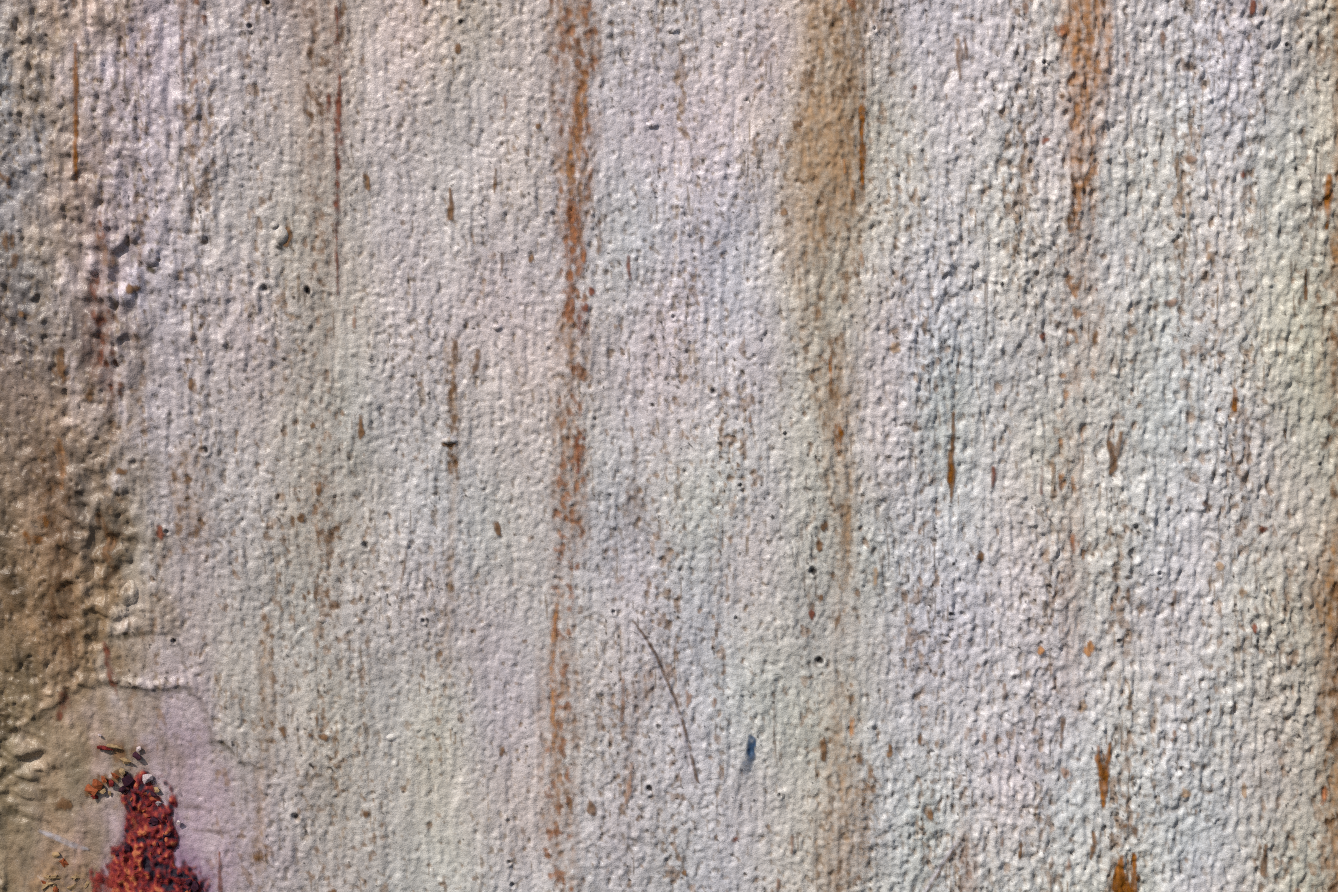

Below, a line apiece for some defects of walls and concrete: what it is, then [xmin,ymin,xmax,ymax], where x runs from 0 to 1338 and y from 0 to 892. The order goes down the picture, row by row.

rust [557,0,599,360]
rust [797,0,865,256]
rust [1055,0,1110,124]
rust [557,417,585,490]
rust [57,798,72,810]
rust [84,734,221,892]
rust [550,605,595,847]
rust [1112,853,1140,892]